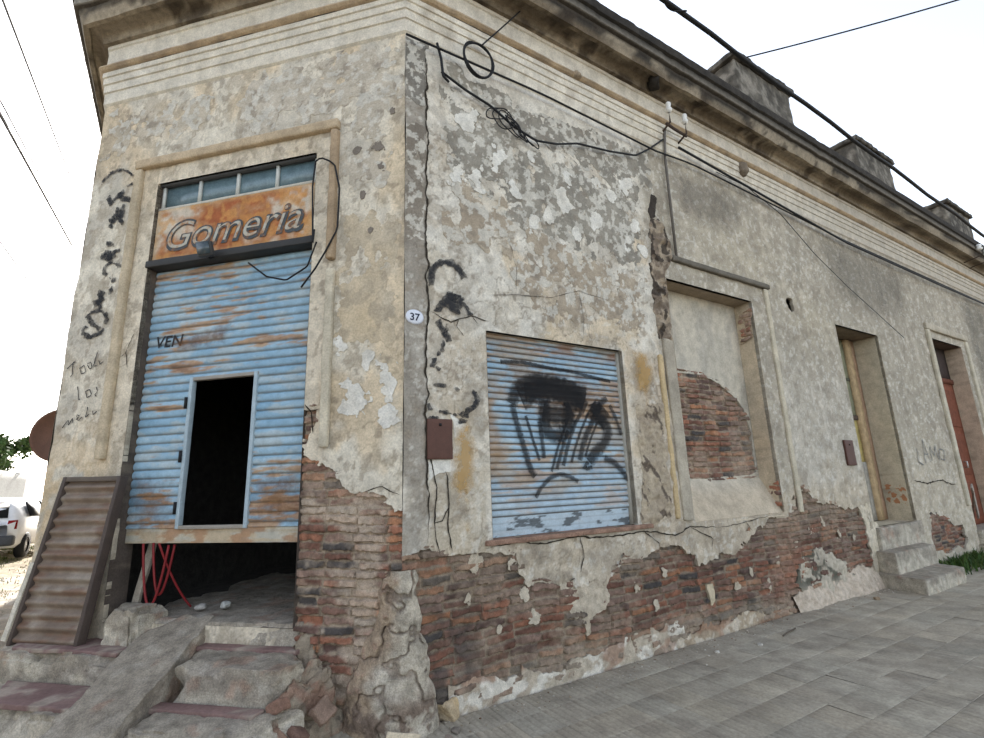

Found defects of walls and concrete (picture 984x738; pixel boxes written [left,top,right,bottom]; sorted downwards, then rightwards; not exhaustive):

peeling [333,122,430,429]
peeling [233,36,673,346]
flaking render [293,403,873,722]
flaking render [677,368,758,482]
flaking render [929,510,965,553]